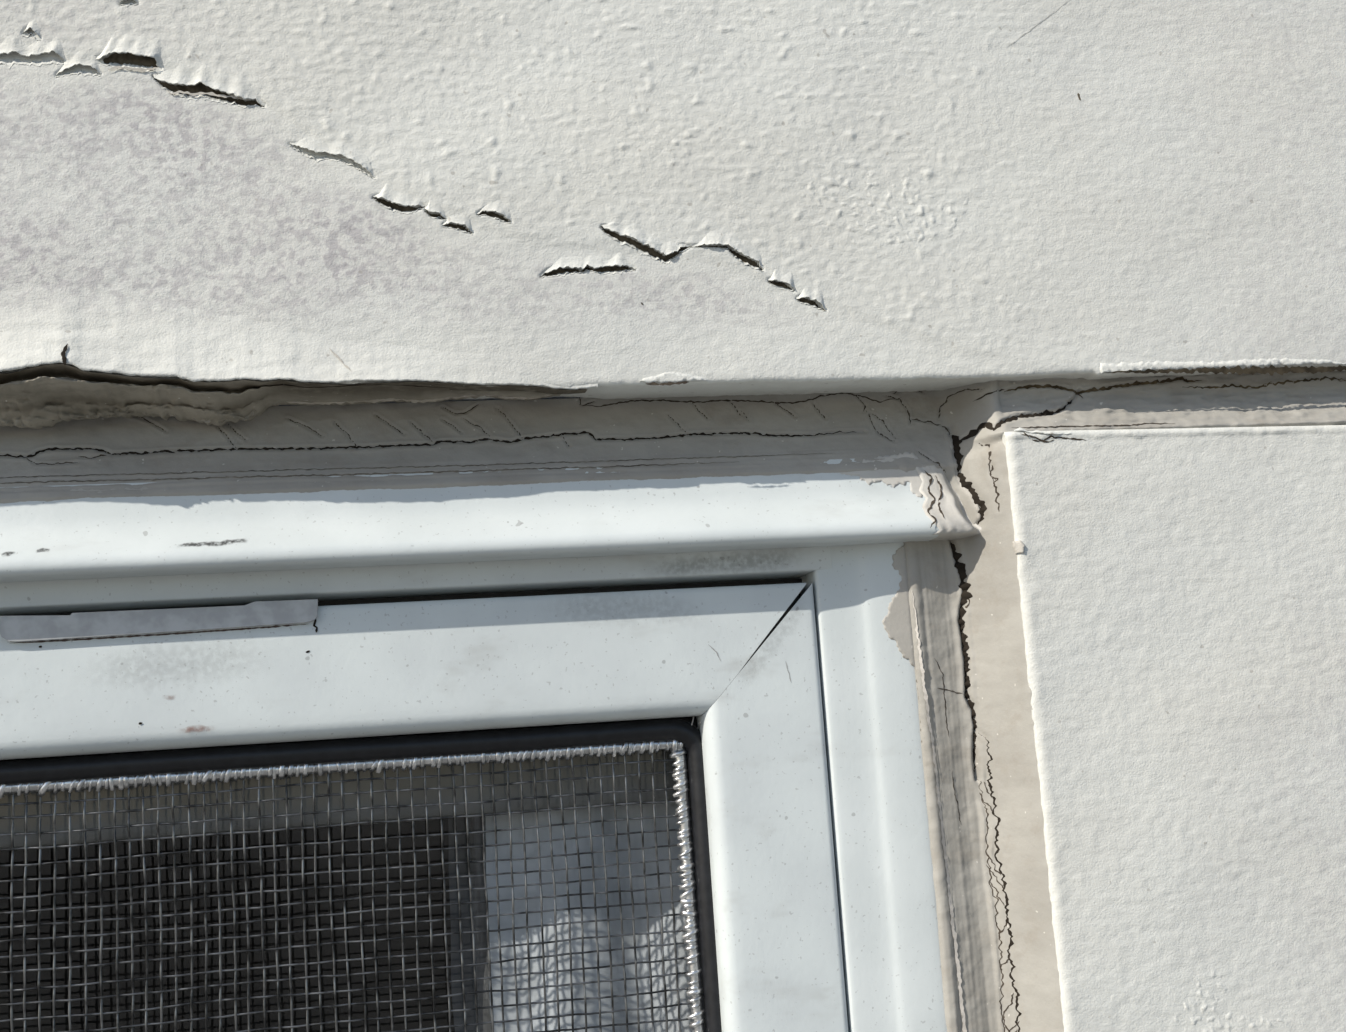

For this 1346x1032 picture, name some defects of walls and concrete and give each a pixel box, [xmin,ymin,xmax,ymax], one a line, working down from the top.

peeling [0,20,266,108]
peeling [289,135,513,235]
peeling [540,221,827,311]
peeling [841,452,923,498]
crack [0,365,1346,1032]